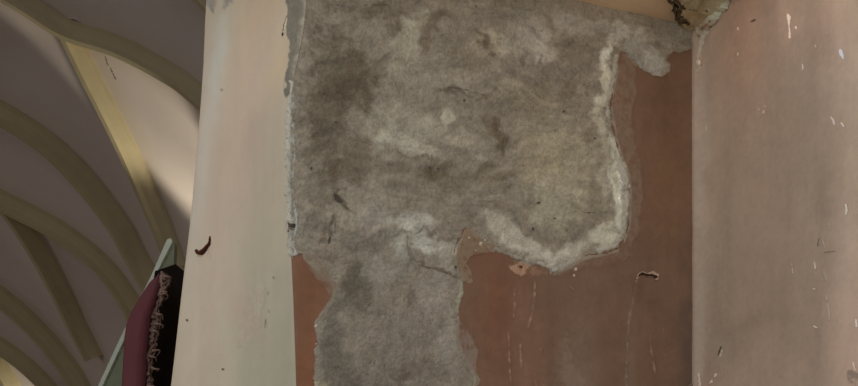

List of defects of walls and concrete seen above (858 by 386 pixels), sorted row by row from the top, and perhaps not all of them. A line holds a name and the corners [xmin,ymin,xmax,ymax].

peeling [206,0,239,15]
flaking render [282,0,737,386]